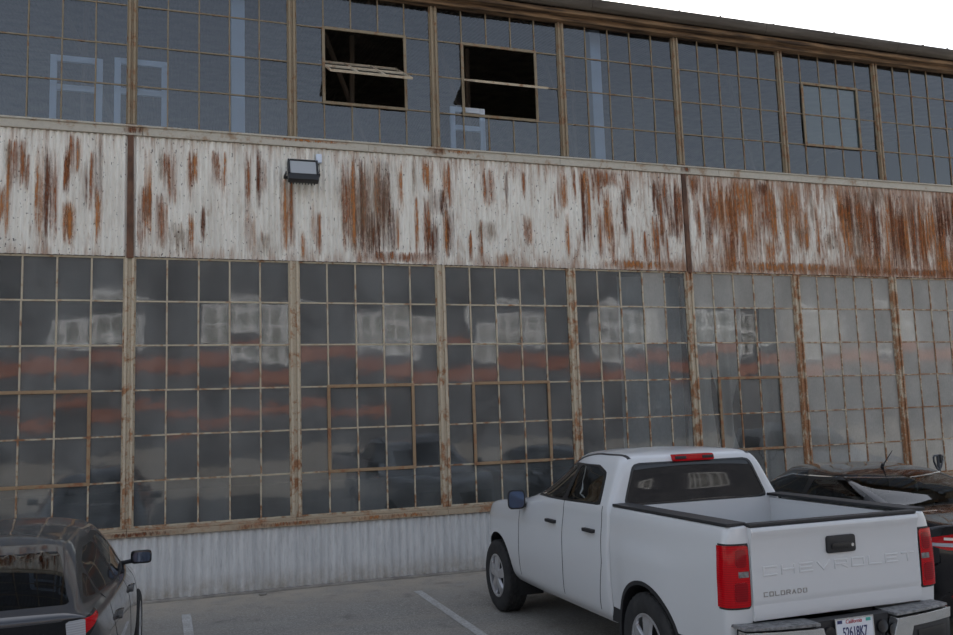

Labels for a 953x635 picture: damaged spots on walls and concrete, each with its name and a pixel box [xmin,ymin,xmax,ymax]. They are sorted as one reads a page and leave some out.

rust [0,136,101,243]
rust [245,152,261,204]
rust [283,179,305,257]
rust [342,150,469,262]
rust [469,223,493,258]
rust [557,171,683,269]
rust [681,167,831,273]
rust [836,189,953,277]